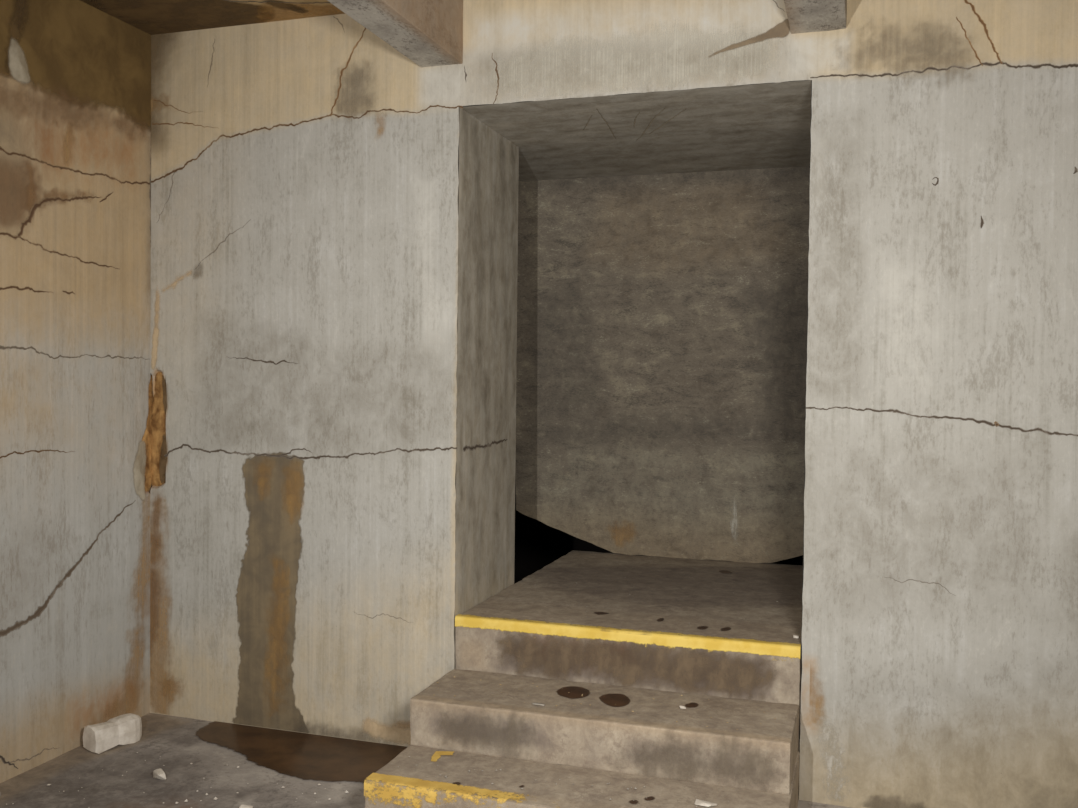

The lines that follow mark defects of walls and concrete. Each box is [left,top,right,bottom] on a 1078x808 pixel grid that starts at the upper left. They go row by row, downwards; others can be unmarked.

crack [810,0,1078,78]
crack [491,58,499,104]
crack [0,28,463,269]
crack [0,286,75,295]
crack [0,346,147,360]
crack [805,407,1078,436]
crack [0,450,74,459]
crack [164,439,507,460]
crack [0,500,136,637]
rust [133,516,175,714]